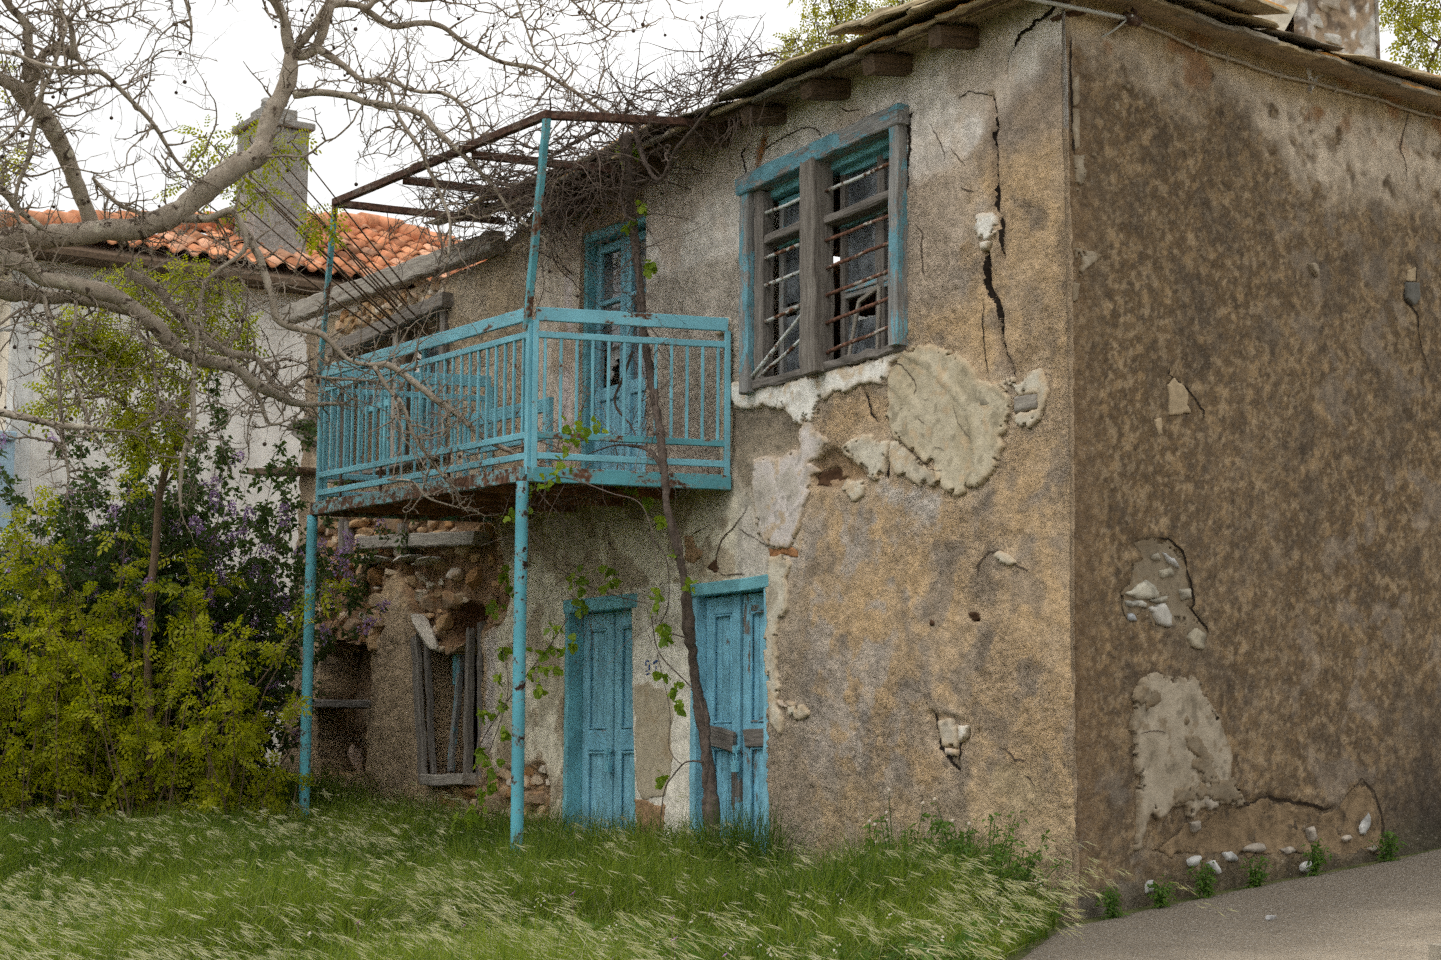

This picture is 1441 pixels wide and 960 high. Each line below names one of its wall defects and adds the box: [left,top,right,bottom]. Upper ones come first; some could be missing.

crack [1008,6,1075,155]
crack [906,91,1015,374]
peeling [715,317,937,734]
spalling [1120,537,1209,649]
flaking render [934,712,970,771]
peeling [1132,685,1162,711]
spalling [1152,715,1384,875]